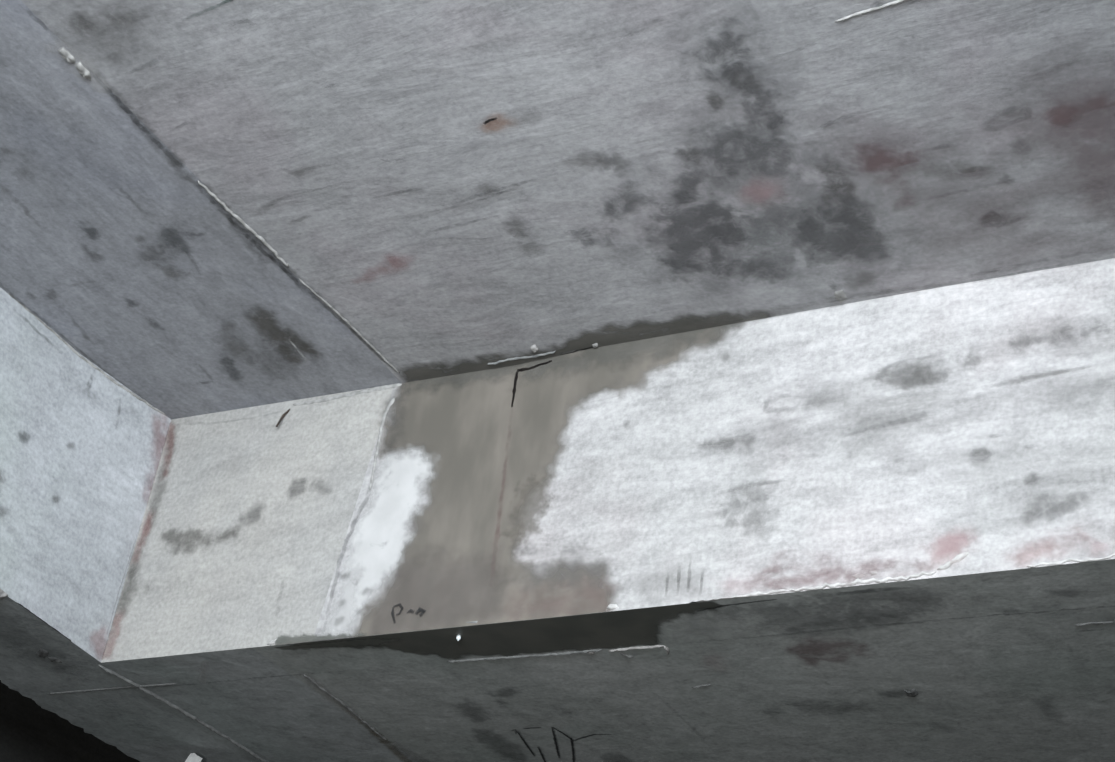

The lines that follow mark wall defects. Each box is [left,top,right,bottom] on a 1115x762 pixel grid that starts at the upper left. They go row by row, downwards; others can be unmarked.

leakage [704,32,782,173]
leakage [661,174,746,274]
leakage [251,311,317,362]
leakage [294,312,936,659]